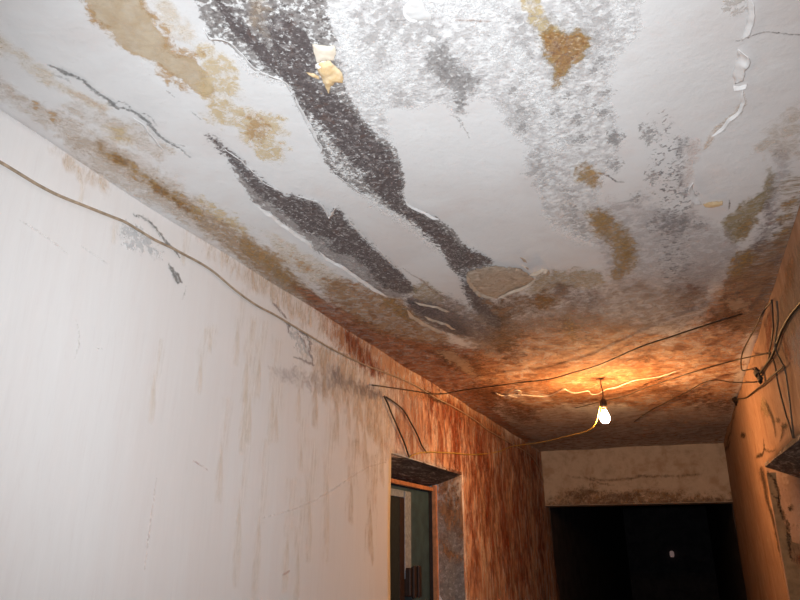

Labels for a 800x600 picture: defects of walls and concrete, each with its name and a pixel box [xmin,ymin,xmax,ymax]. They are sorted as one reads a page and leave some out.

crack [49,65,182,150]
leakage [85,0,285,159]
spalling [194,0,550,338]
leakage [325,0,710,345]
peeling [711,49,750,137]
crack [273,303,314,366]
rust [96,142,794,600]